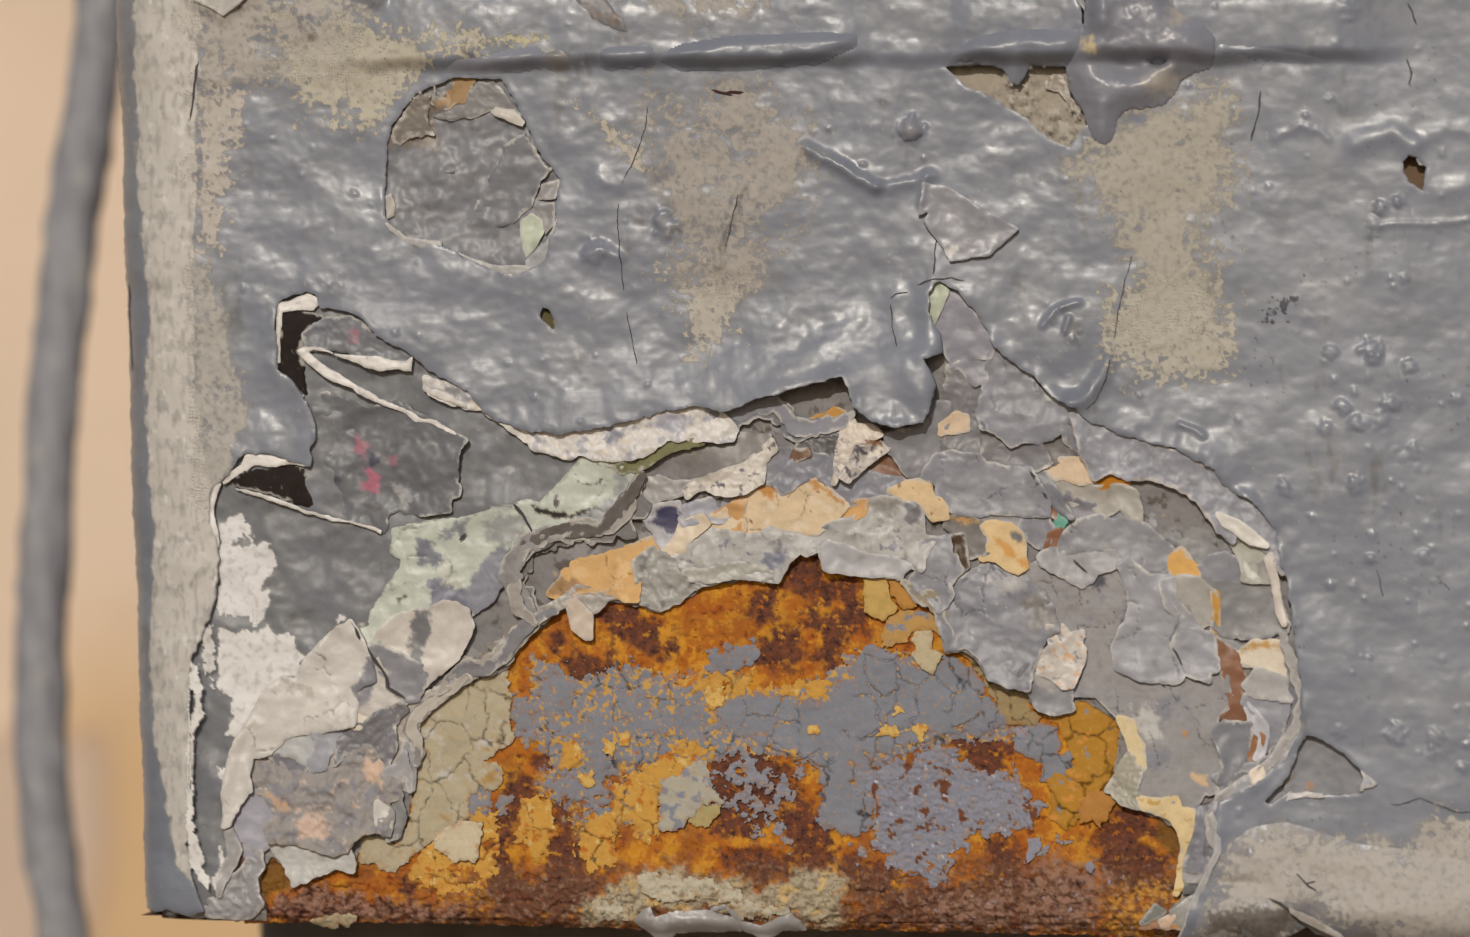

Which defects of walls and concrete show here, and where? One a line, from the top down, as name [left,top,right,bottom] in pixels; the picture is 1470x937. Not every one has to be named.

peeling [193,0,244,16]
peeling [918,182,1019,262]
rust [243,555,1182,937]
peeling [187,282,1378,931]